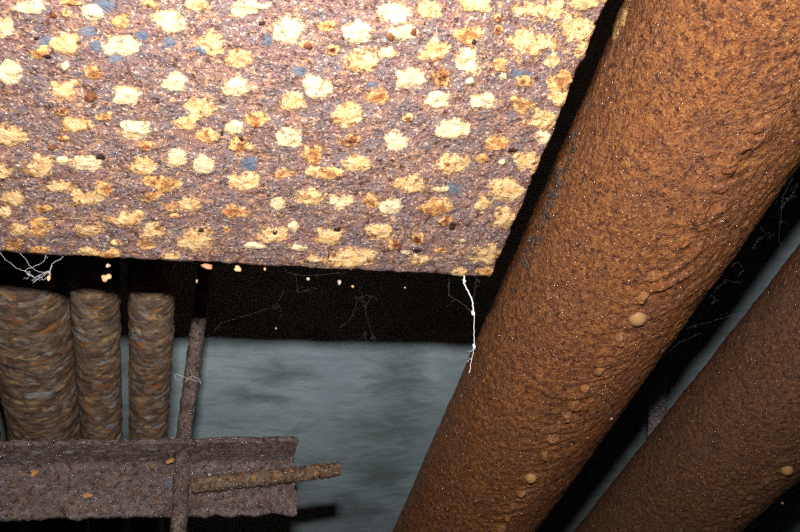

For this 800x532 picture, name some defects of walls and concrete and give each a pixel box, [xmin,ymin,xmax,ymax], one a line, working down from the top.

corrosion [60,0,141,56]
corrosion [161,71,268,156]
corrosion [196,28,256,98]
corrosion [279,74,333,111]
corrosion [275,87,390,180]
corrosion [317,0,442,74]
corrosion [395,0,607,228]
corrosion [0,153,112,206]
corrosion [49,65,251,282]
corrosion [295,136,510,227]
corrosion [243,220,448,270]
corrosion [451,239,502,276]